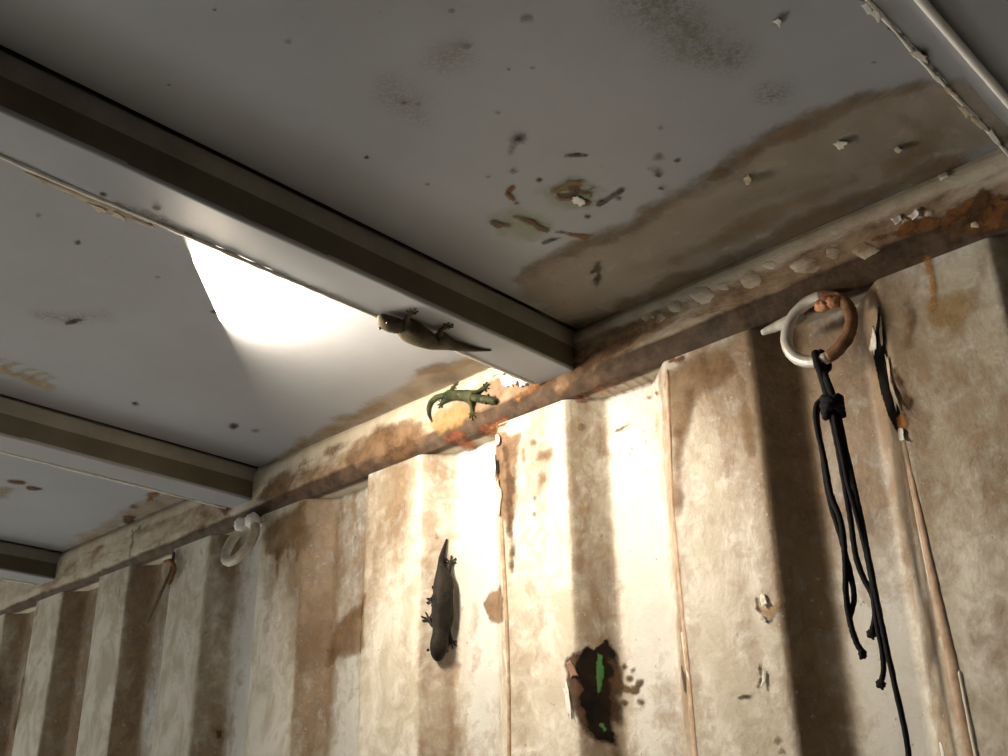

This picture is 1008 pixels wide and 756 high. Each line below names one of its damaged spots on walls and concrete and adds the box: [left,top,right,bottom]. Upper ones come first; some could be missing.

peeling [861,0,1004,147]
leakage [555,202,670,258]
leakage [618,159,958,311]
rust [873,190,1008,244]
rust [347,406,477,467]
rust [259,473,295,501]
rust [479,416,535,570]
peeling [563,660,580,719]